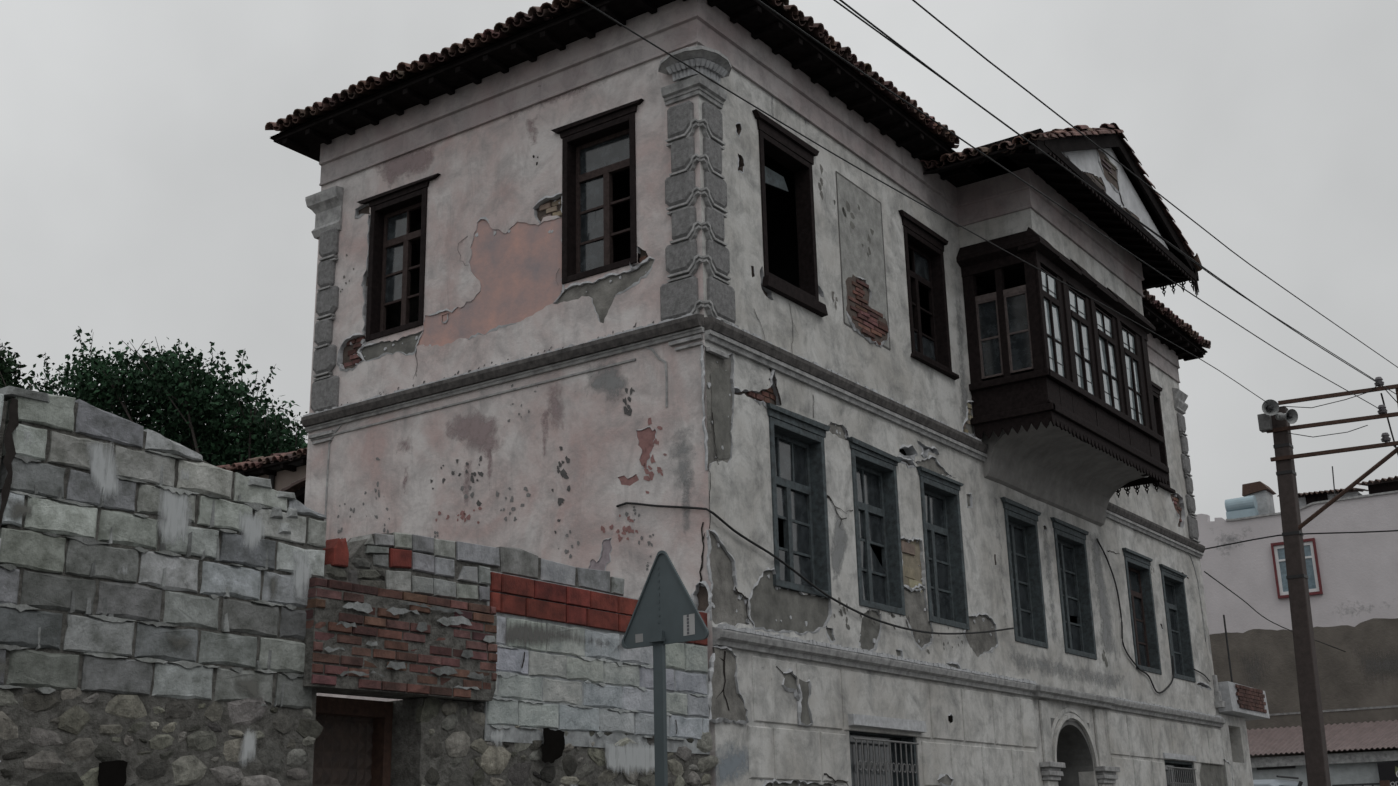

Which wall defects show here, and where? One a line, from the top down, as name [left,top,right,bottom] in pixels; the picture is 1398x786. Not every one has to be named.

spalling [337,193,655,372]
spalling [832,275,890,348]
peeling [618,387,667,494]
spalling [700,345,780,471]
peeling [551,446,580,558]
peeling [588,506,654,571]
spalling [691,529,998,669]
spalling [708,645,749,725]
spalling [782,668,813,727]
spalling [762,778,837,786]